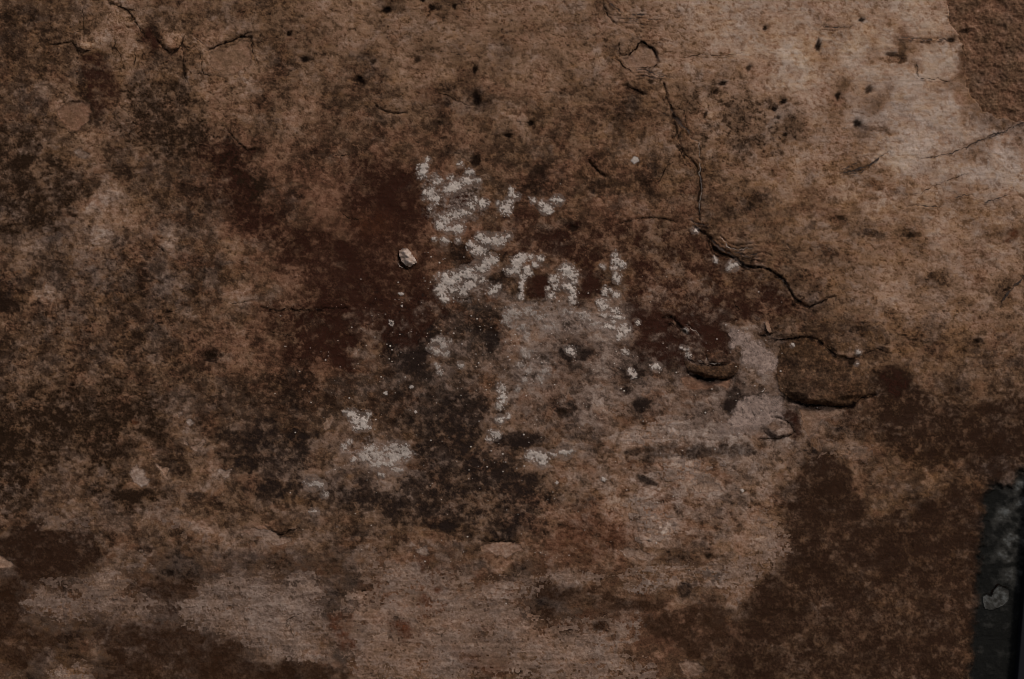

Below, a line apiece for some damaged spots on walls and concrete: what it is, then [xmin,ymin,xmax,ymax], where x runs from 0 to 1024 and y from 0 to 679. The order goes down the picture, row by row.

leakage [82,53,807,542]
crack [603,0,830,308]
crack [912,122,1024,208]
leakage [534,365,1024,679]